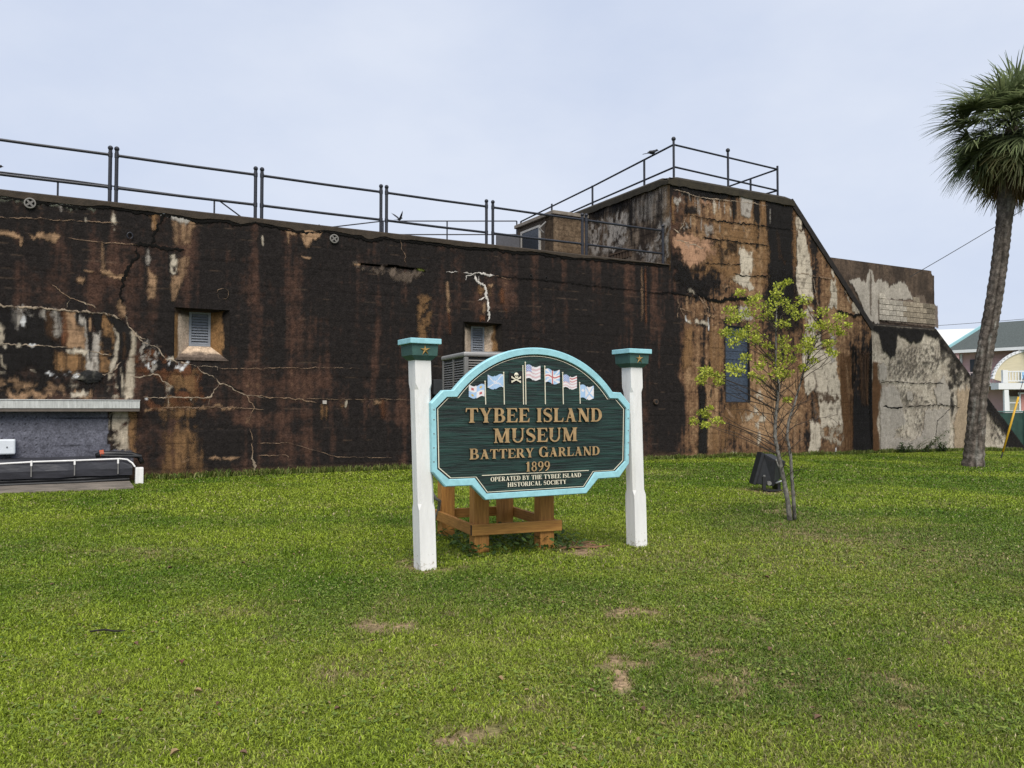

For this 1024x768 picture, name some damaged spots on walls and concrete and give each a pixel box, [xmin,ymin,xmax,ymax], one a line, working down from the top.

leakage [170,255,185,300]
leakage [588,200,633,256]
peeling [672,232,717,268]
leakage [643,186,802,332]
peeling [722,247,755,291]
peeling [737,196,753,218]
spalling [3,343,121,376]
leakage [0,300,188,452]
crack [0,197,791,471]
leakage [697,362,712,455]
peeling [795,216,938,453]
peeling [879,362,970,450]